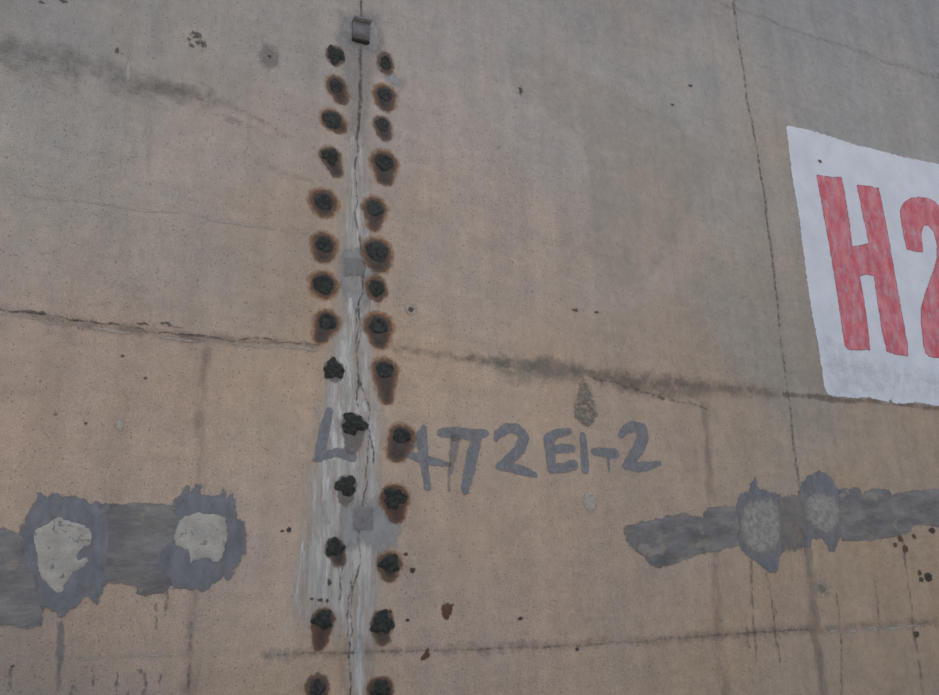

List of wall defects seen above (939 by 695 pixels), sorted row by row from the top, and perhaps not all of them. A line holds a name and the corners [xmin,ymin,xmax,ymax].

crack [354,45,375,505]
crack [0,310,319,351]
crack [573,370,733,400]
crack [339,531,361,694]
rust [441,603,454,619]